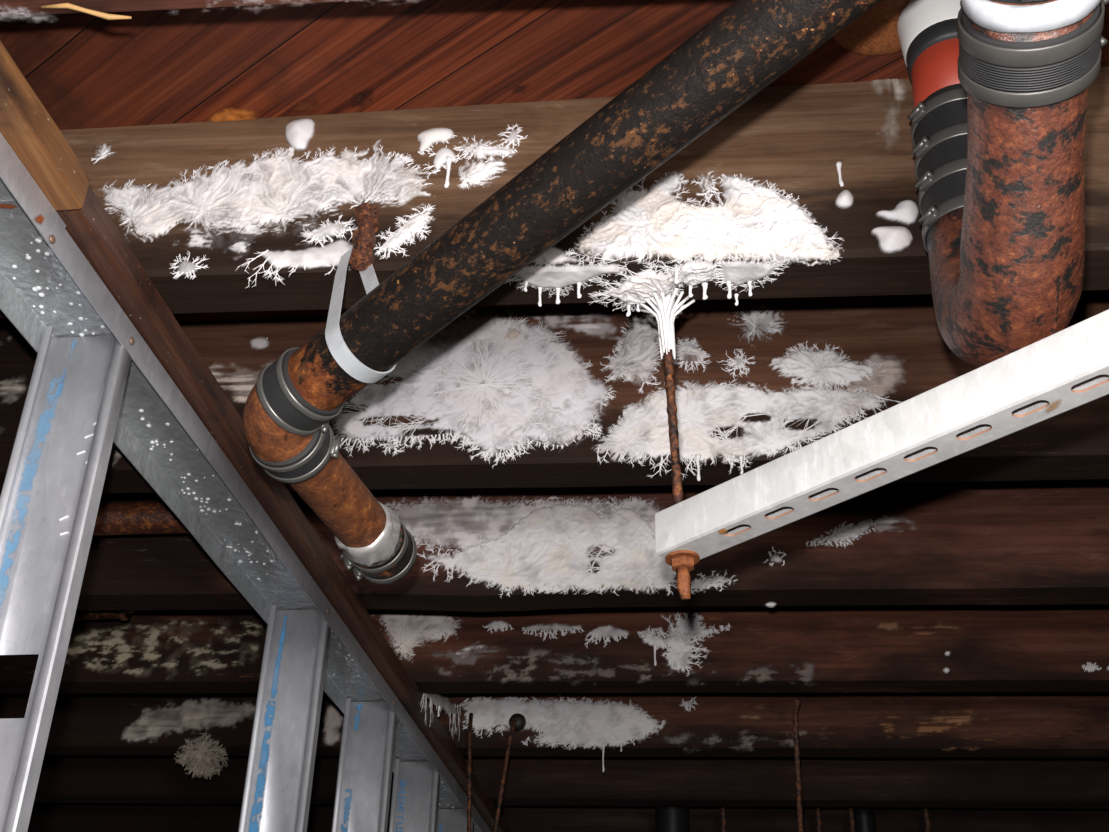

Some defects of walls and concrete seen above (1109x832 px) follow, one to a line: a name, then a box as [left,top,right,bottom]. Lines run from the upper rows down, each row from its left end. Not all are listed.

damp [0,380,24,394]
damp [847,355,902,396]
damp [372,609,652,681]
damp [744,667,777,681]
damp [791,664,813,681]
damp [123,699,256,741]